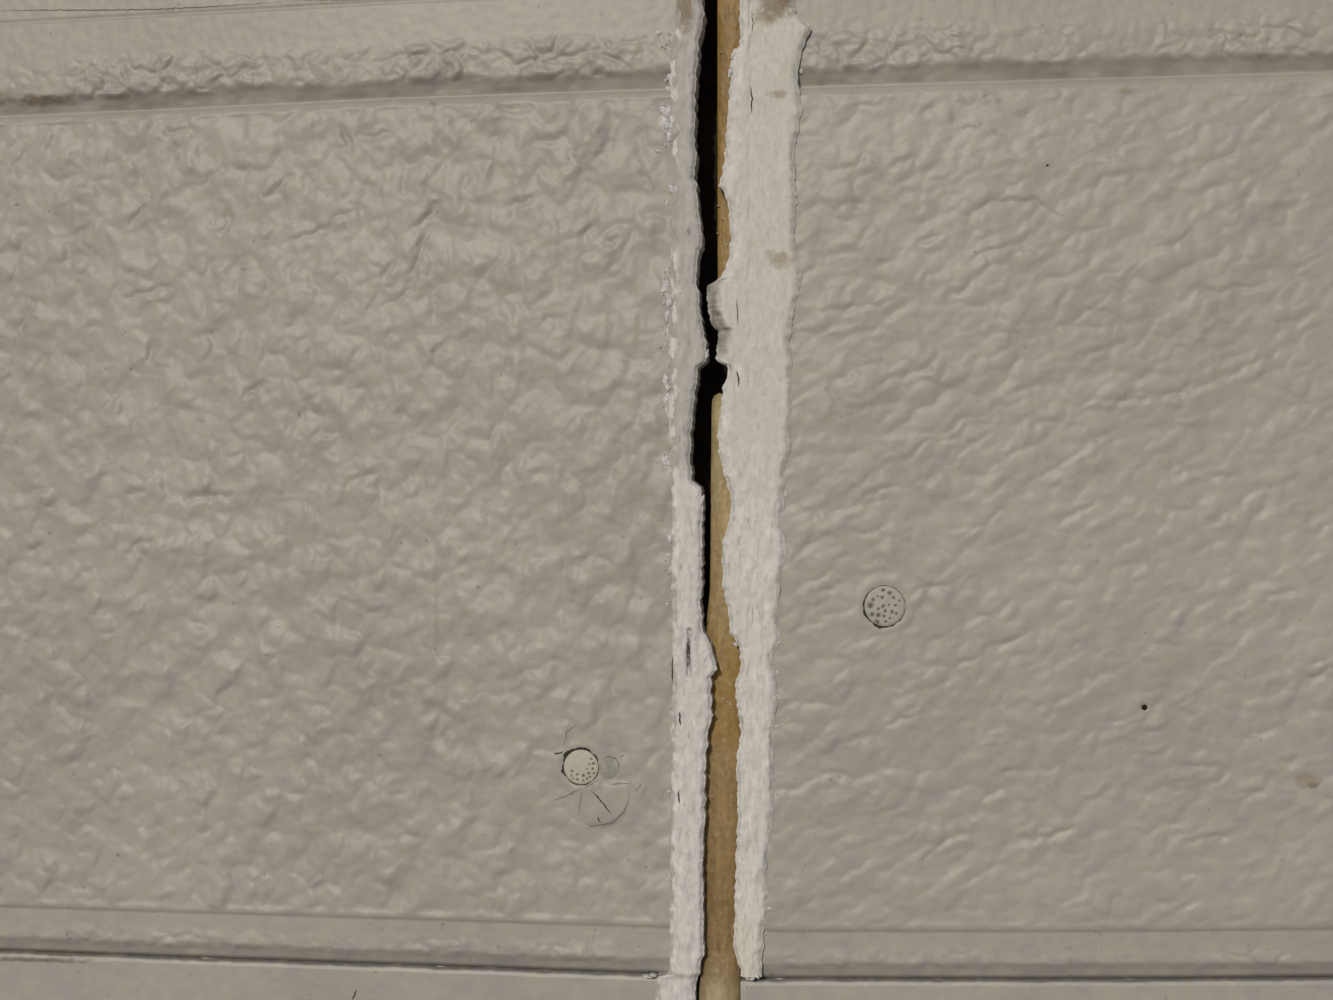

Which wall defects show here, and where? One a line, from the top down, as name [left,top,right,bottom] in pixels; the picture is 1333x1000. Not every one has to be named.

crack [672,0,739,725]